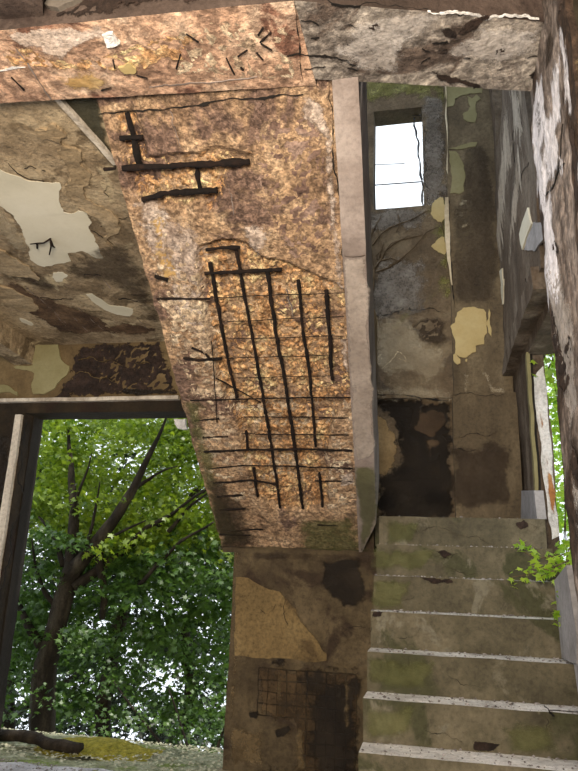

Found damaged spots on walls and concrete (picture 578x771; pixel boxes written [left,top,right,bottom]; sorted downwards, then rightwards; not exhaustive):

spalling [0,96,357,511]
crack [99,0,539,149]
crack [328,96,340,204]
damp [303,97,509,517]
flaking render [413,307,492,365]
flaking render [431,71,482,285]
efflorescence [496,90,523,263]
damp [532,29,577,422]
flaking render [234,577,327,662]